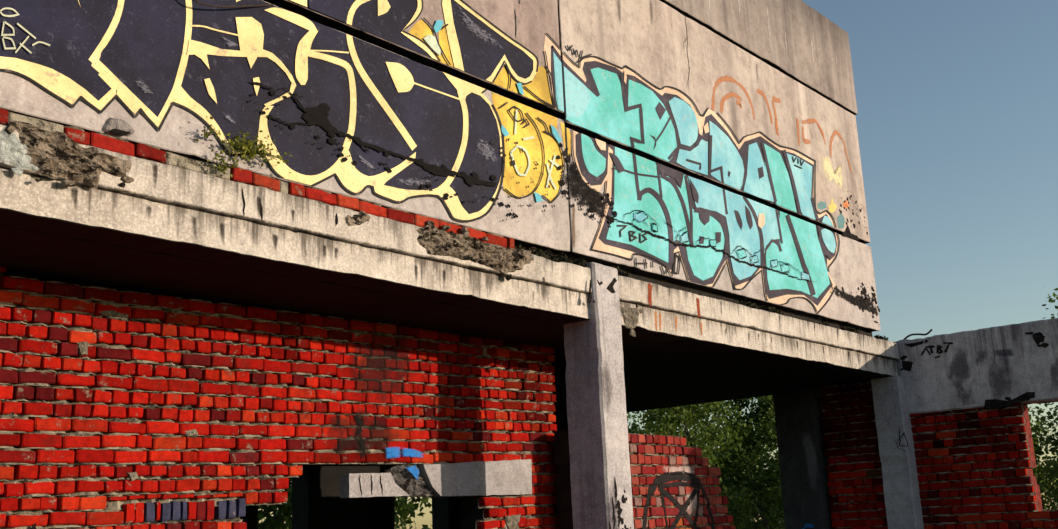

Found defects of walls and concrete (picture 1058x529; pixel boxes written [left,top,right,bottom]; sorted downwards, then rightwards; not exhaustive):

spalling [0,121,134,189]
spalling [416,221,536,281]
corrosion [648,283,661,330]